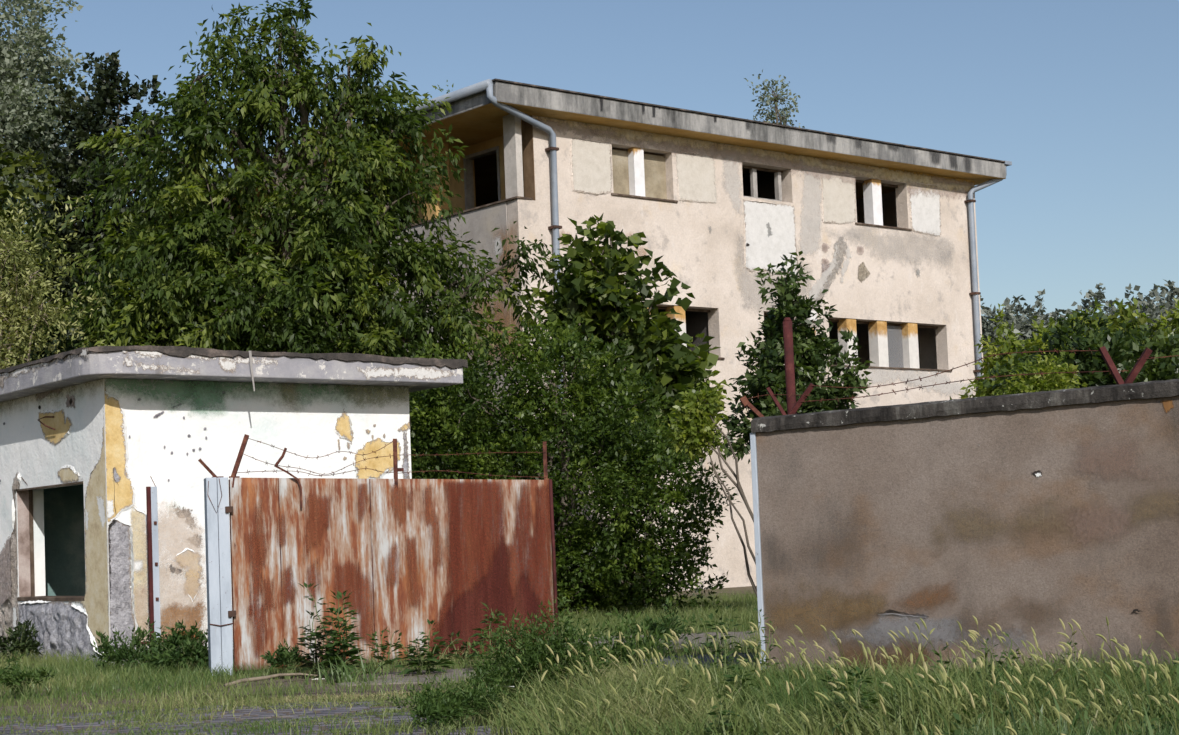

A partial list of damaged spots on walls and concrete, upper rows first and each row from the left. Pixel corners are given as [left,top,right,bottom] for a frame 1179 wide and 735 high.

peeling [0,348,88,389]
peeling [333,409,411,479]
peeling [0,382,148,665]
peeling [169,504,204,604]
corrosion [248,502,295,656]
corrosion [305,495,331,602]
corrosion [335,562,375,645]
corrosion [358,483,367,518]
corrosion [387,480,554,660]